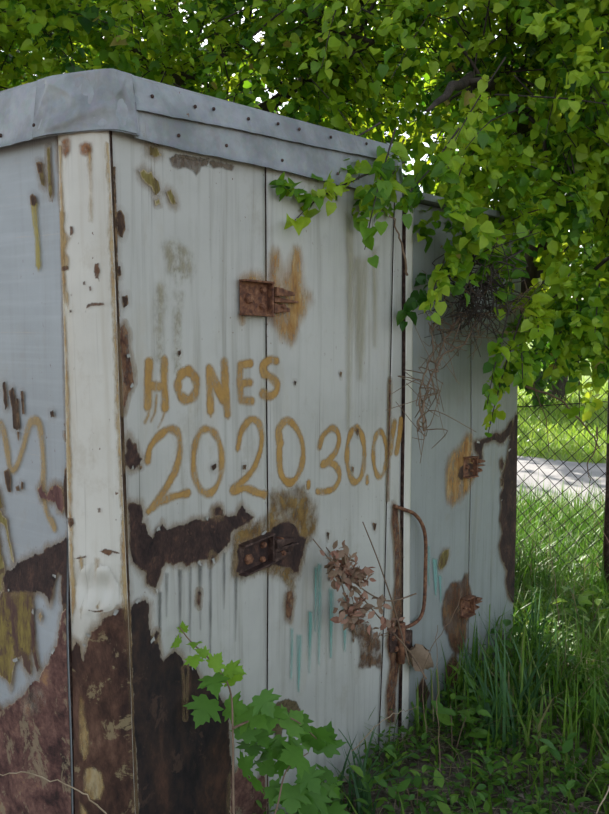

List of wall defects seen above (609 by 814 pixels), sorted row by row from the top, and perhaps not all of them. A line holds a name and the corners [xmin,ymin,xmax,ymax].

corrosion [271,248,307,342]
corrosion [0,138,268,814]
corrosion [446,435,474,503]
peeling [128,502,254,592]
corrosion [232,487,317,621]
corrosion [443,573,472,698]
corrosion [418,679,430,706]